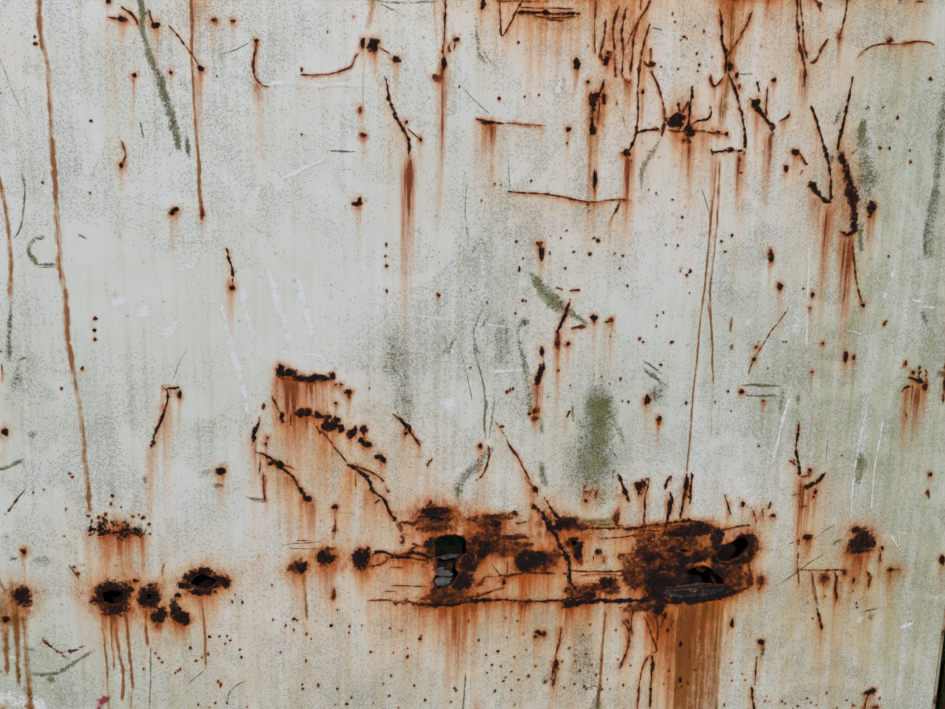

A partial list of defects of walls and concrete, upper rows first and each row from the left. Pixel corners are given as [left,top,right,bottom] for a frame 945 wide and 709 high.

corrosion [665,86,729,158]
corrosion [858,200,877,252]
corrosion [274,364,386,463]
corrosion [459,510,561,576]
corrosion [840,526,901,608]
corrosion [149,597,190,628]
corrosion [543,515,765,709]